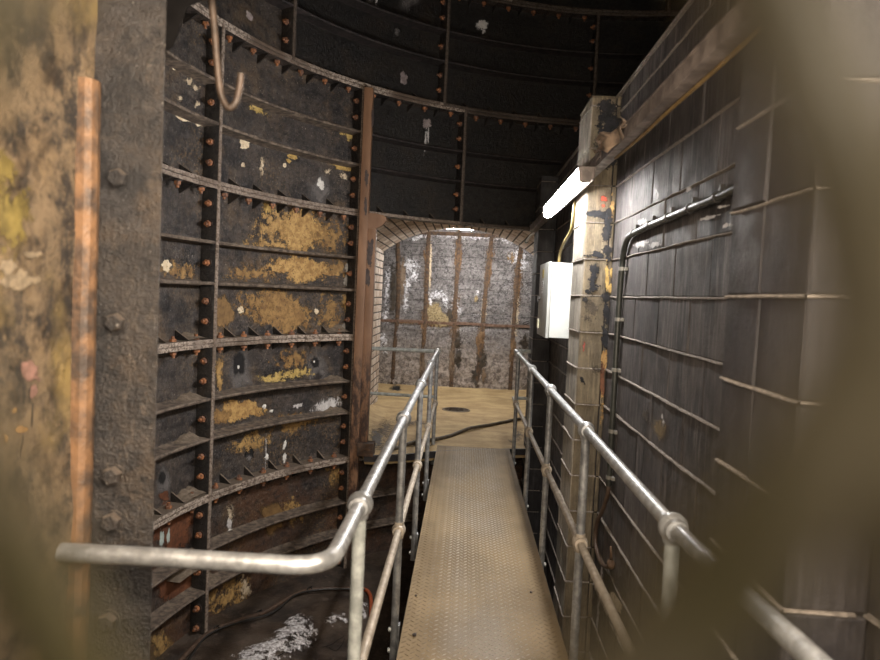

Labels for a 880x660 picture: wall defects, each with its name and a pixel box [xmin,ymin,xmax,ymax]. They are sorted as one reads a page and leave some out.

damp [402,257,419,313]
corrosion [389,235,463,379]
corrosion [508,250,524,374]
damp [294,396,342,412]
corrosion [153,511,194,549]
damp [231,612,348,660]